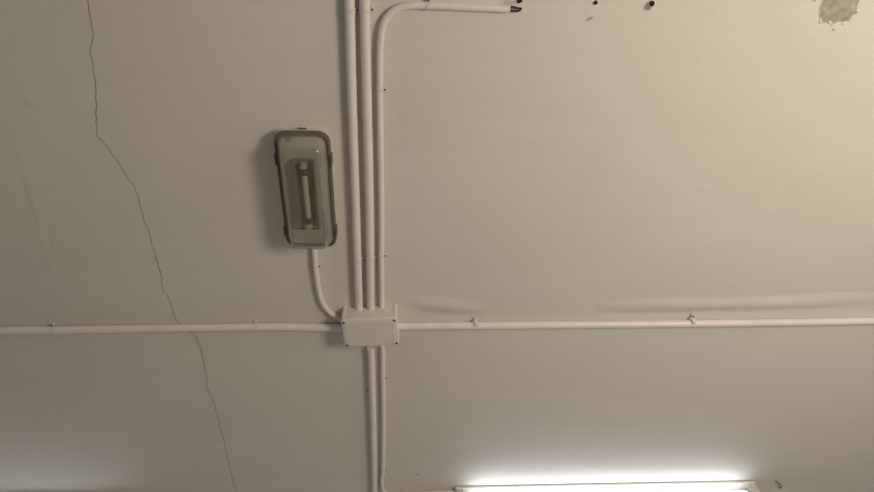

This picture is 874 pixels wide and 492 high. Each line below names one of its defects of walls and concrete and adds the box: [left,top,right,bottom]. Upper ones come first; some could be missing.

crack [87,0,236,489]